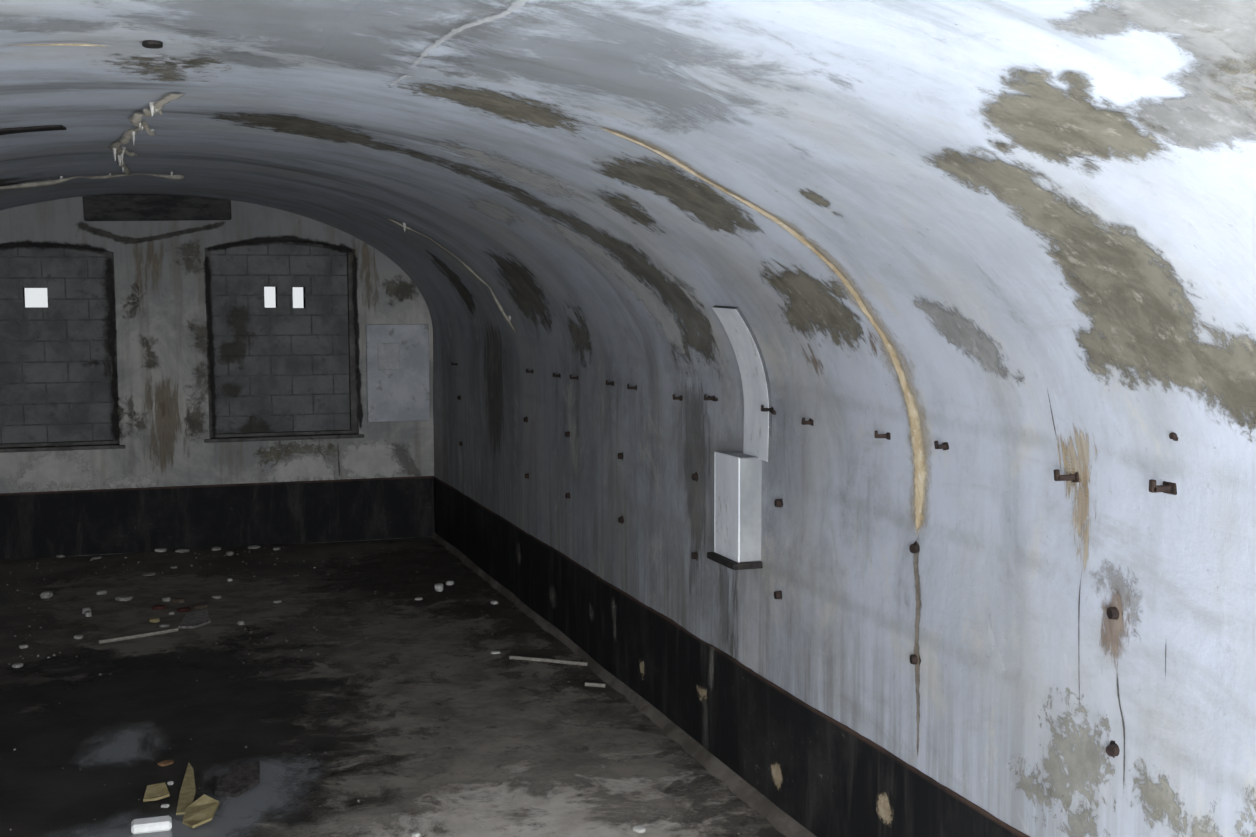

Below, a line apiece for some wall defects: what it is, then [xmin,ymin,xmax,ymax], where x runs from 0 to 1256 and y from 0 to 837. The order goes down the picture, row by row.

crack [11,41,106,49]
crack [0,94,184,190]
crack [388,219,516,332]
leakage [216,112,717,366]
peeling [387,81,586,139]
flaking render [594,152,764,234]
flaking render [914,0,1256,441]
leakage [115,324,240,470]
crack [603,129,927,755]
corrosion [1057,429,1096,569]
corrosion [1101,591,1130,664]
peeling [1129,759,1218,837]